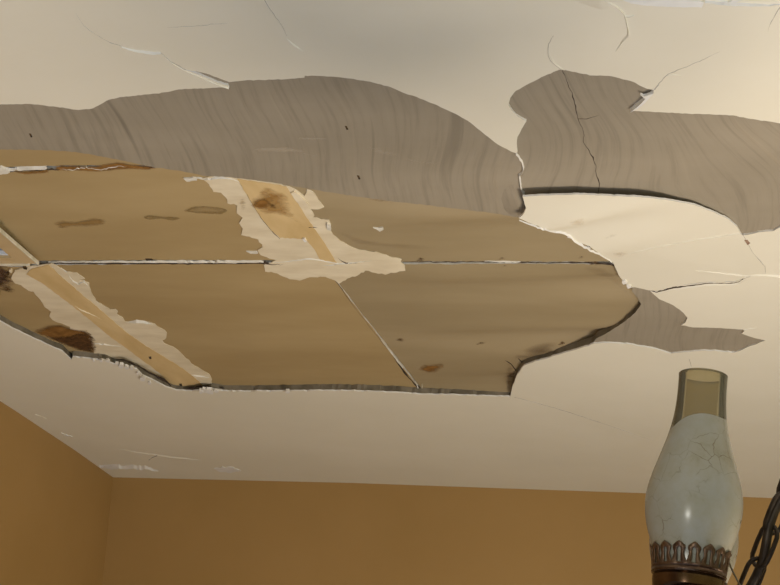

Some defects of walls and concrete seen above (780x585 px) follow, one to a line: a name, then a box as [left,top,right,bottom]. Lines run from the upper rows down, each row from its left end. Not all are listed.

crack [78,17,229,89]
flaking render [0,70,780,234]
crack [548,35,600,192]
leakage [0,266,12,290]
crack [653,234,780,295]
flaking render [0,279,761,395]